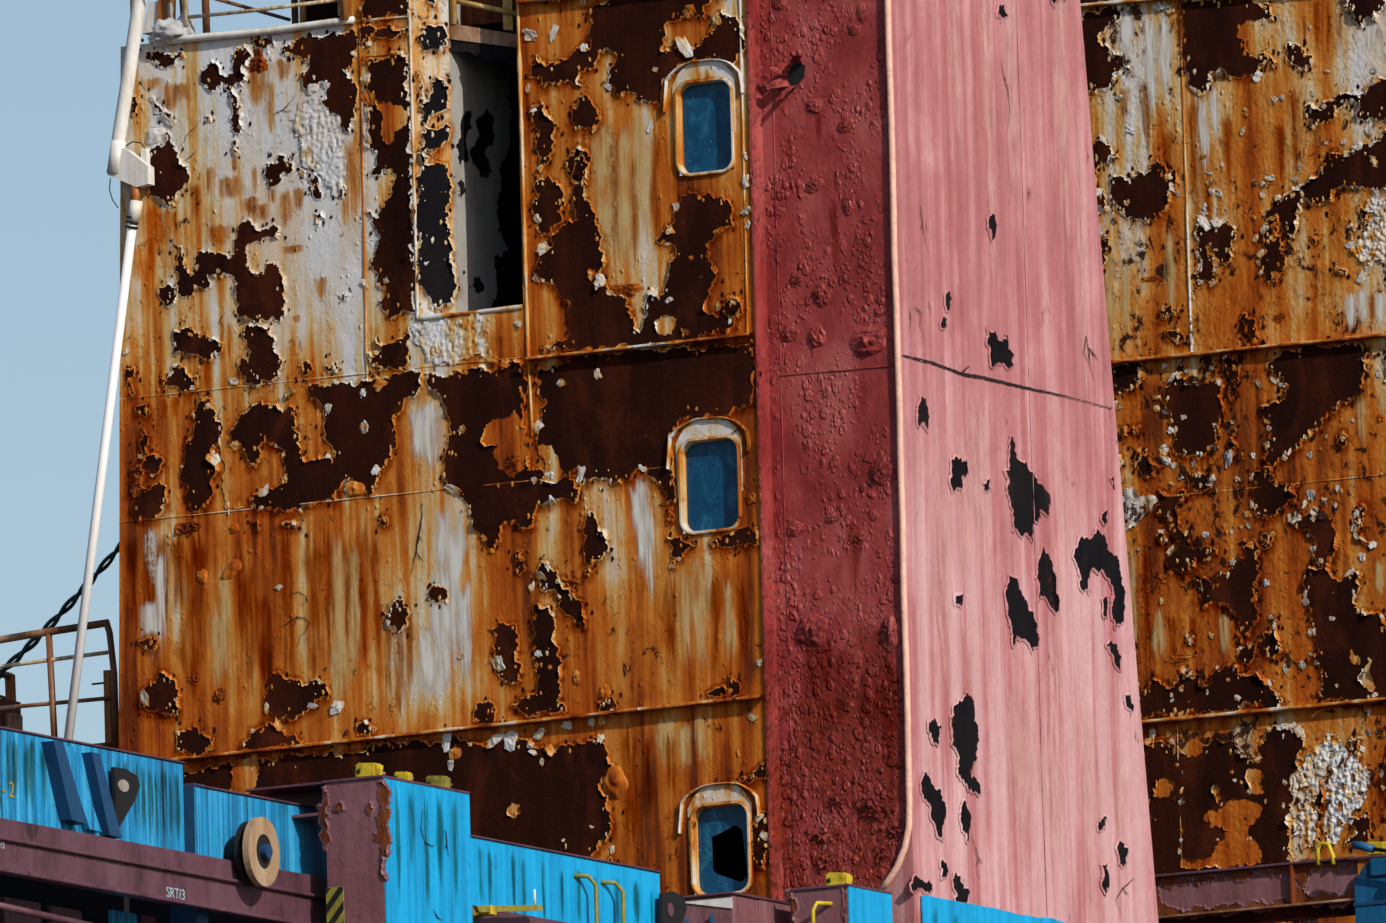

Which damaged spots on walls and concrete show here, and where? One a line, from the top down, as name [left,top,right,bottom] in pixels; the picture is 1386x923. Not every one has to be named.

rust [247,190,301,219]
peeling [1151,0,1386,293]
rust [1279,94,1297,163]
leakage [411,399,437,466]
peeling [122,0,767,882]
crack [903,300,1112,409]
rust [128,538,203,627]
rust [306,536,412,672]
leakage [419,512,471,690]
peeling [948,434,1060,656]
peeling [1072,302,1386,923]
peeling [909,691,981,904]